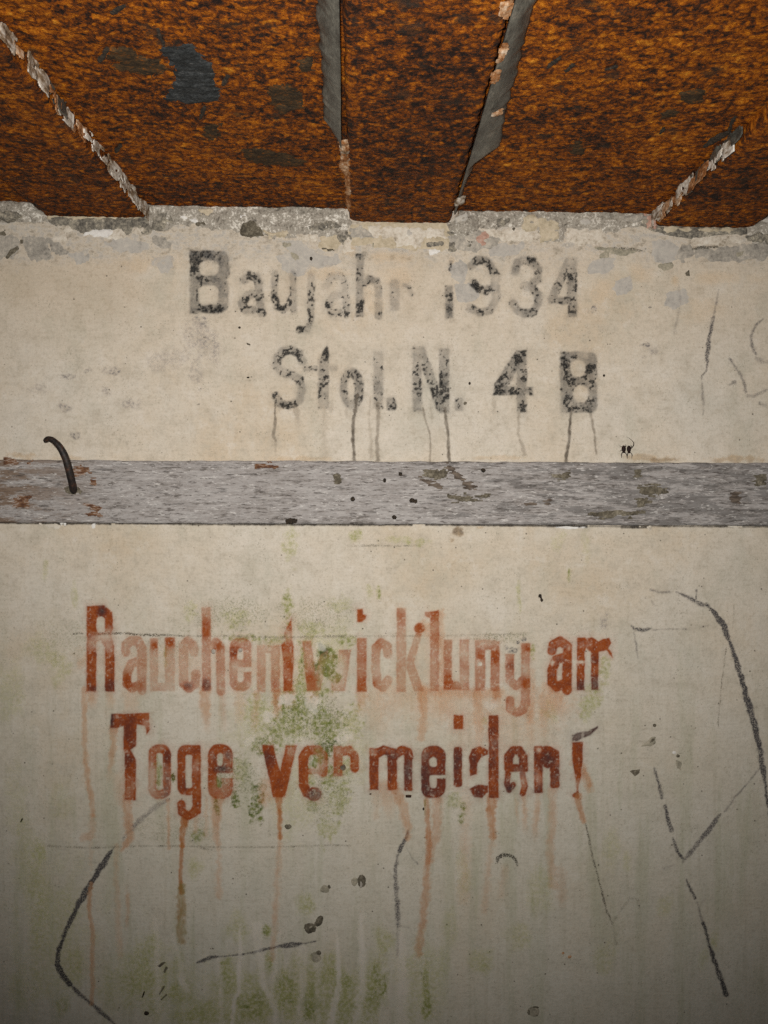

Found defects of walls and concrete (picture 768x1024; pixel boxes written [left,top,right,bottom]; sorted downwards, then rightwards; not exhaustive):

peeling [498,0,514,20]
flaking render [0,22,768,310]